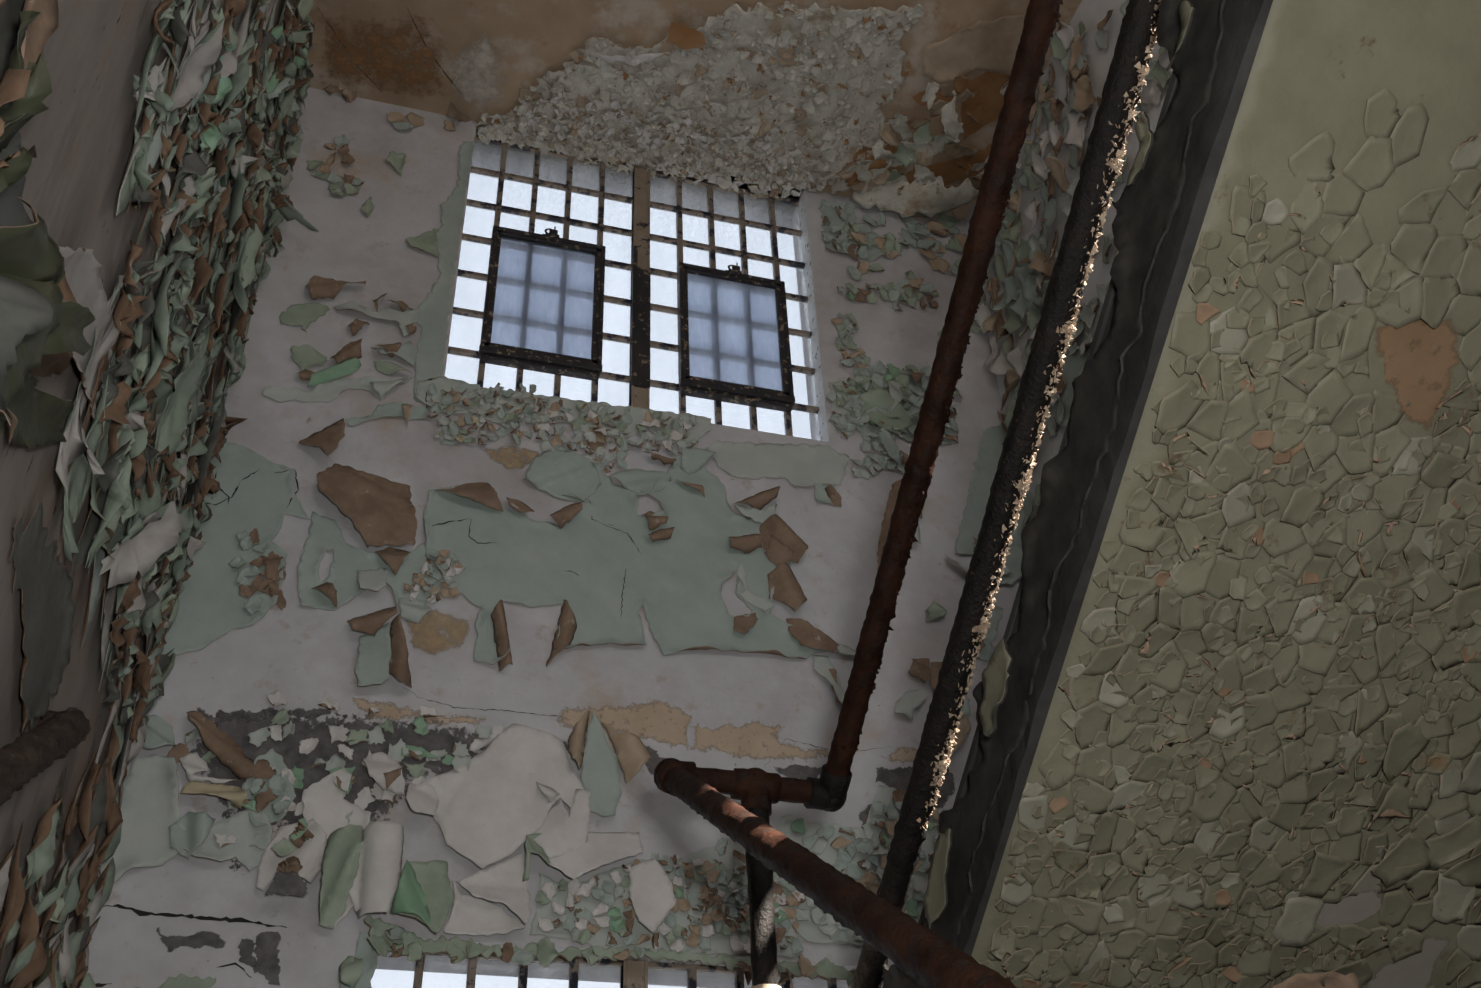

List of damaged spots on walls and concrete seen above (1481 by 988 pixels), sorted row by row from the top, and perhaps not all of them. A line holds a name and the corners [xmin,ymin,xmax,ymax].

peeling [903,0,1481,988]
crack [103,904,287,928]
crack [219,962,252,978]